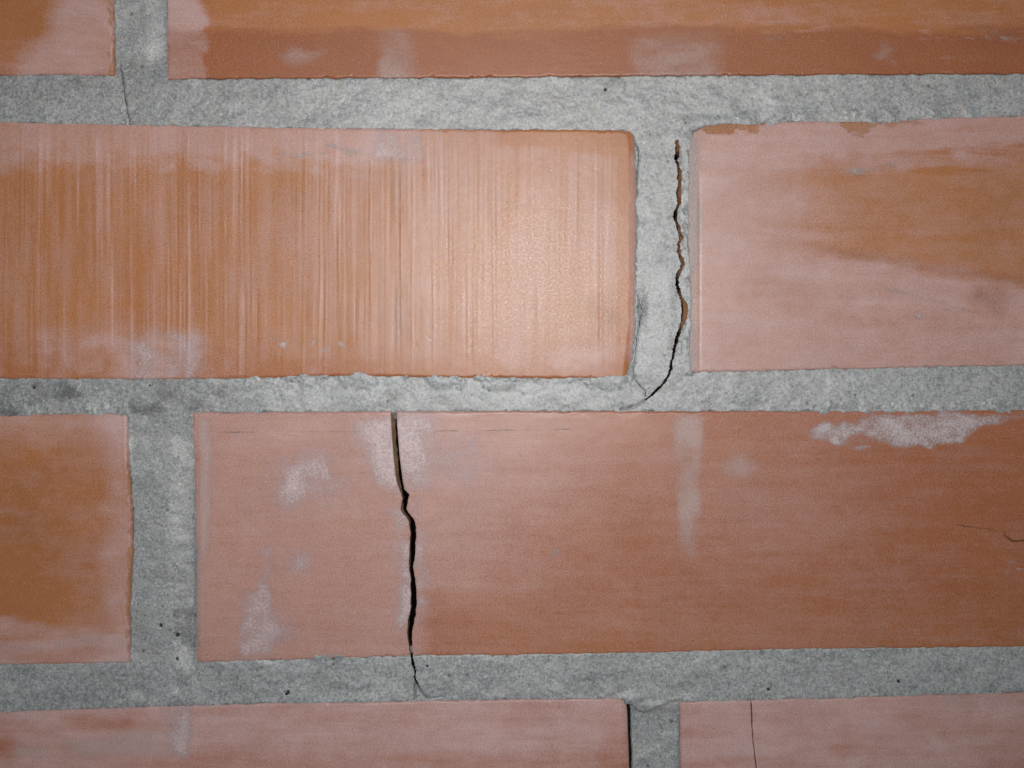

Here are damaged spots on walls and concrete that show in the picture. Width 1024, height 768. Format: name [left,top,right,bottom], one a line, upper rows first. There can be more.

crack [621,140,689,410]
crack [391,412,427,698]
efflorescence [810,410,1011,449]